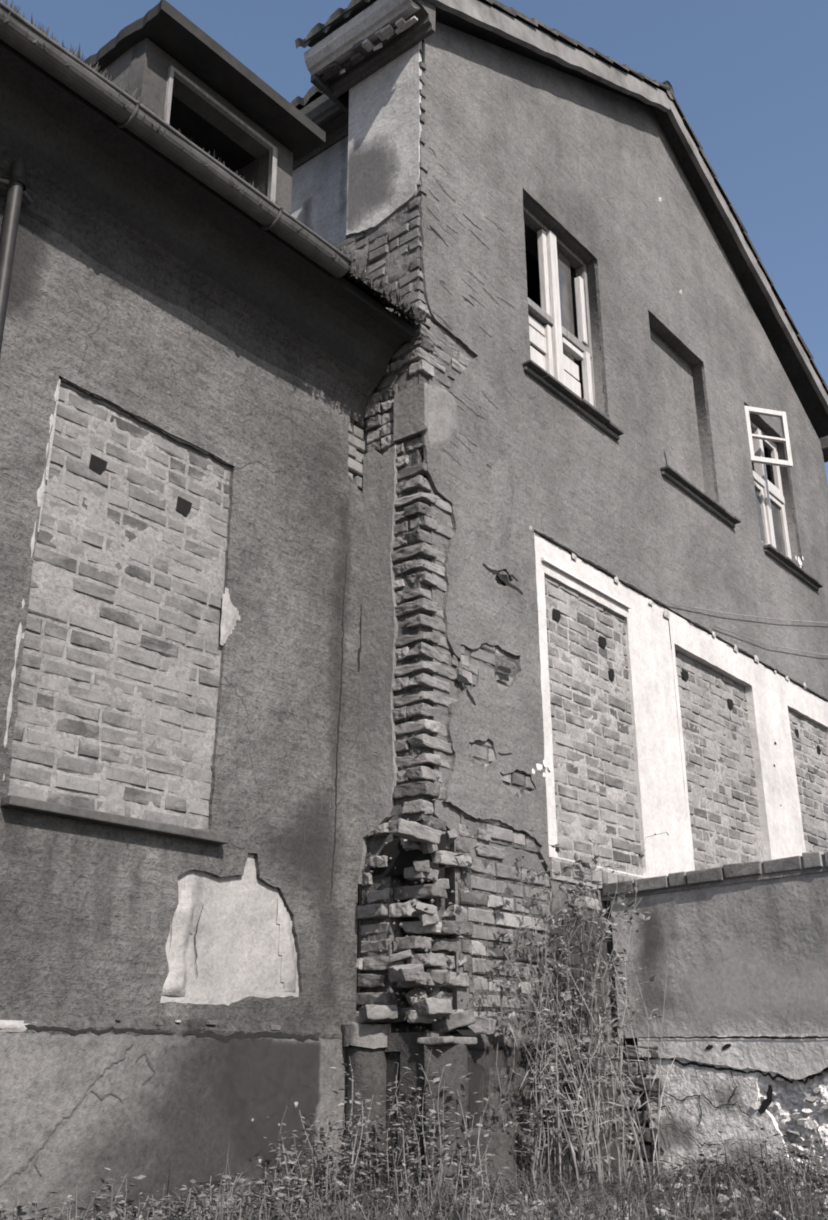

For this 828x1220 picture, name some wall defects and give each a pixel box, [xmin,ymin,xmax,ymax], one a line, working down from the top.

water stain [348,146,392,228]
spalling [337,162,523,800]
flaking render [469,740,535,799]
flaking render [460,812,541,852]
flaking render [160,854,299,1006]
flaking render [454,855,552,1019]
flaking render [567,891,601,919]
crack [0,1018,319,1187]
flaking render [751,1071,828,1171]